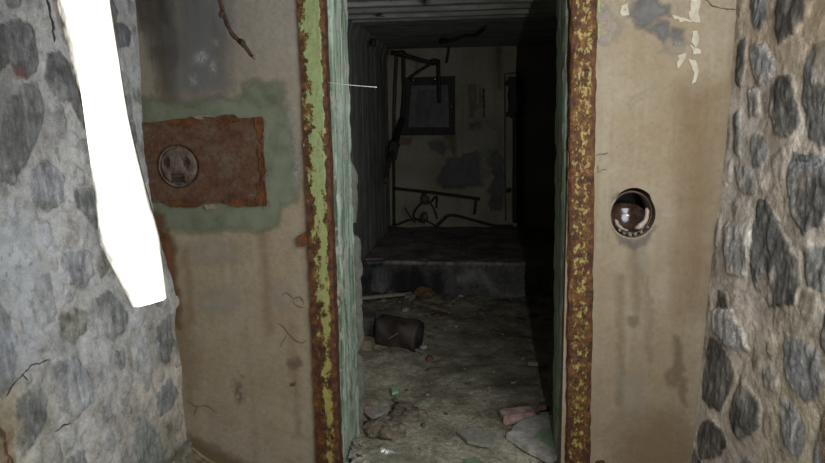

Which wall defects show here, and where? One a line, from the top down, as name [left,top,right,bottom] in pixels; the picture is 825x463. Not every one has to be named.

spalling [597,0,701,84]
corrosion [166,115,241,126]
peeling [142,81,298,233]
corrosion [222,117,267,207]
crack [7,359,51,396]